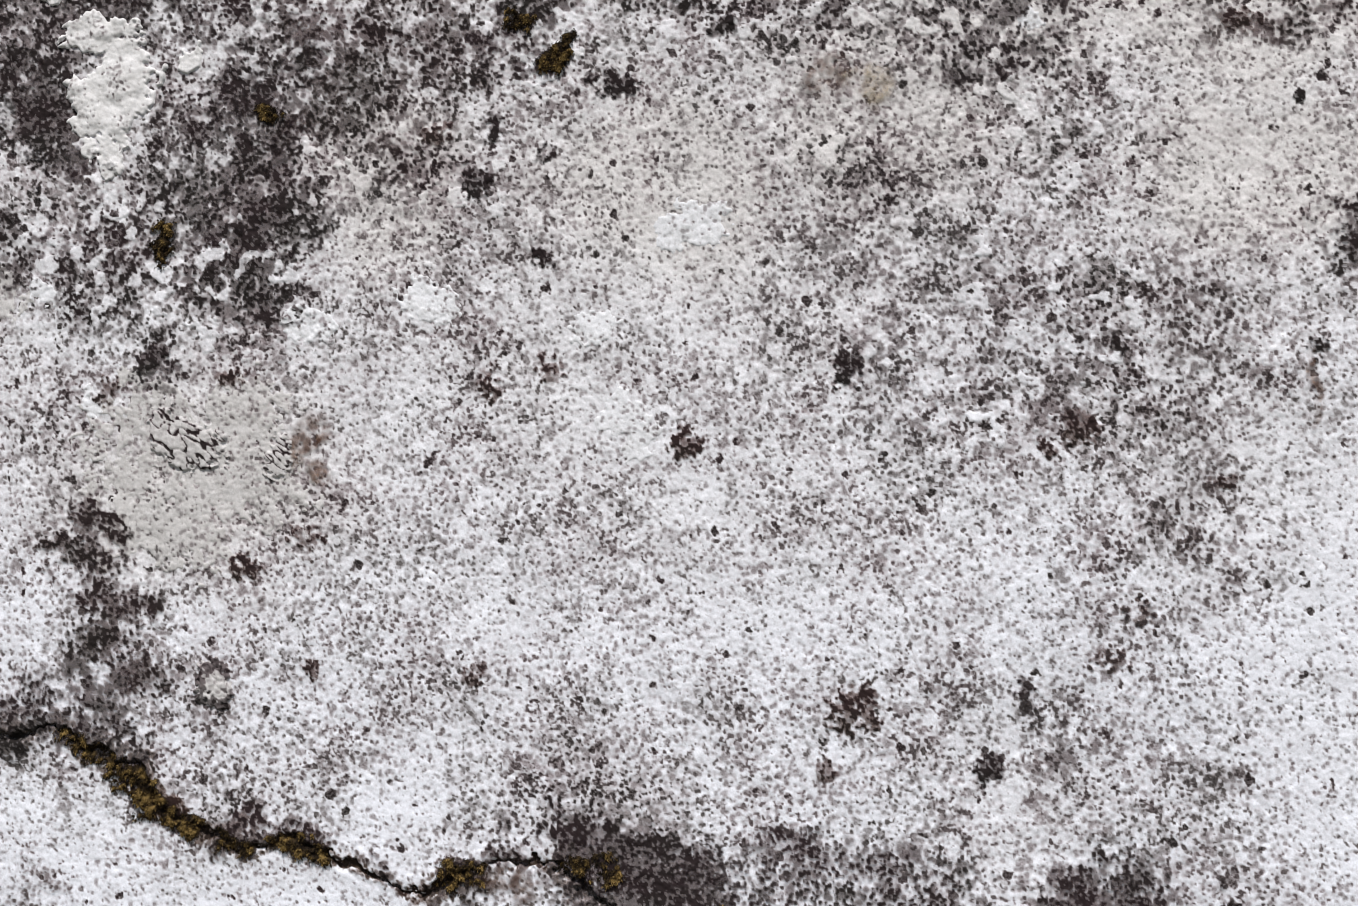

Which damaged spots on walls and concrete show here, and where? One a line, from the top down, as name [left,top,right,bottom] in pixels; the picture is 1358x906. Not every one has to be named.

water stain [612,0,763,15]
water stain [792,0,864,33]
water stain [866,0,1088,99]
water stain [0,0,574,388]
crack [0,713,619,906]
water stain [430,819,528,906]
water stain [535,796,992,906]
mould [1036,834,1187,906]